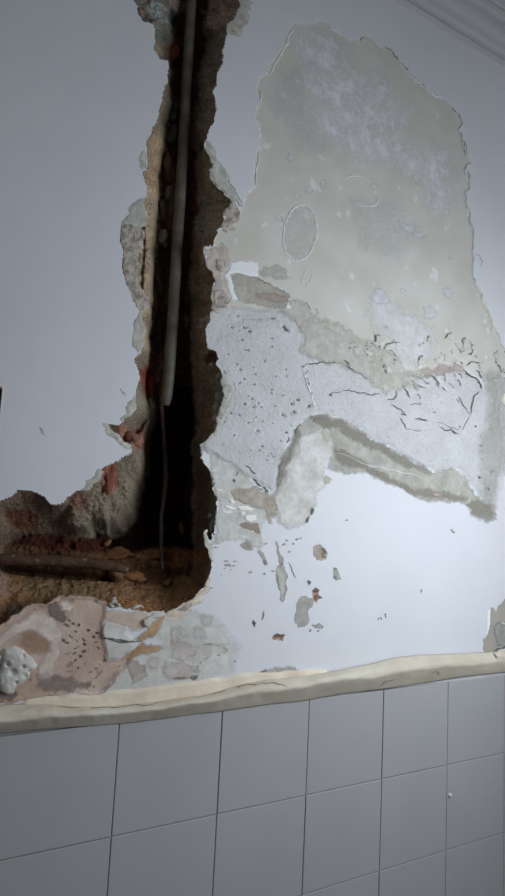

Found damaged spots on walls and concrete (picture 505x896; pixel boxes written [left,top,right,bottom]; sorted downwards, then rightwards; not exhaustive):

crack [254,277,333,331]
peeling [0,0,505,703]
crack [308,360,484,434]
water stain [106,612,235,692]